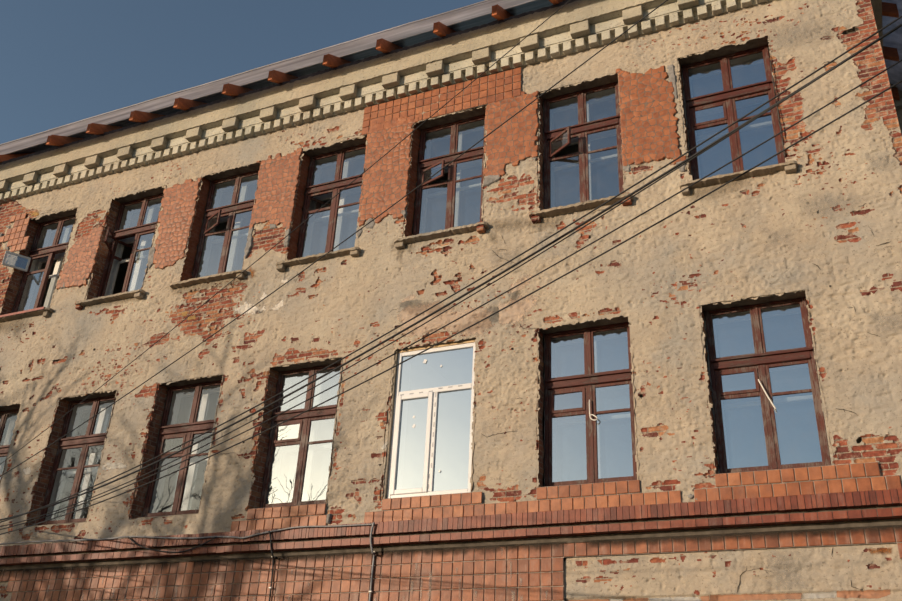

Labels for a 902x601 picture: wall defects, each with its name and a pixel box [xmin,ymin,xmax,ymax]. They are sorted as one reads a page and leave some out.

spalling [820,0,902,165]
spalling [620,2,875,247]
spalling [482,171,540,211]
spalling [0,200,39,307]
spalling [73,209,109,241]
spalling [244,221,289,258]
spalling [641,249,734,315]
spalling [860,273,902,296]
spalling [20,235,620,529]
spalling [0,406,120,540]
spalling [832,427,902,477]
spalling [863,547,892,570]